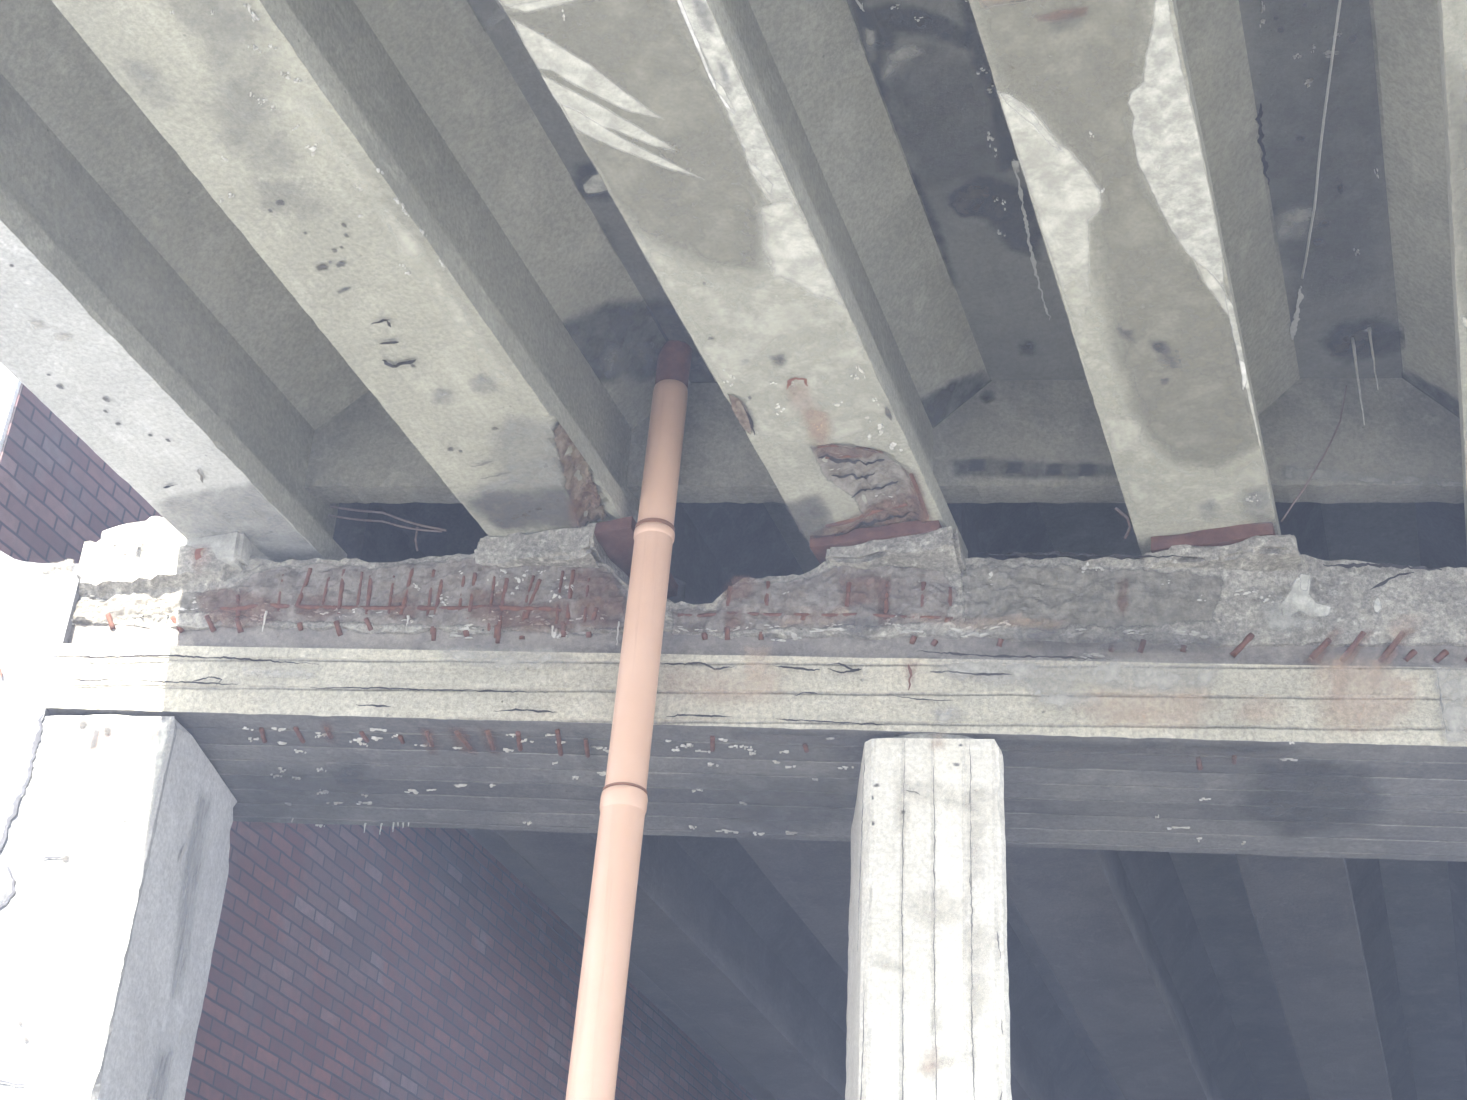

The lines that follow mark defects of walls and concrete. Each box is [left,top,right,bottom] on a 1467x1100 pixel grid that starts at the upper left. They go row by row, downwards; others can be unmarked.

leakage [852,0,1061,320]
leakage [1290,286,1304,340]
leakage [1196,262,1267,474]
spalling [554,423,607,528]
spalling [812,443,929,537]
spalling [41,559,74,575]
spalling [71,558,627,643]
spalling [672,563,1224,653]
spalling [1229,633,1255,658]
spalling [1378,631,1467,663]
crack [667,711,732,719]
crack [0,654,554,908]